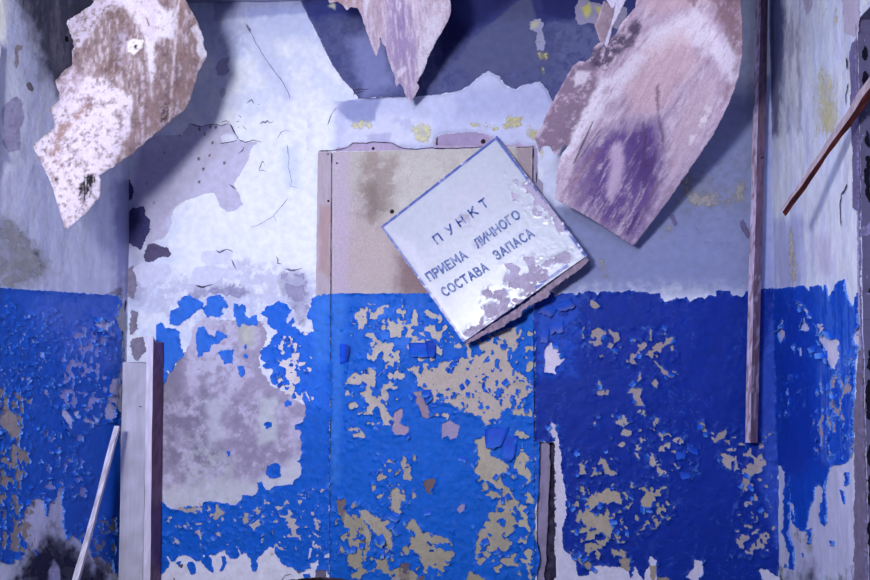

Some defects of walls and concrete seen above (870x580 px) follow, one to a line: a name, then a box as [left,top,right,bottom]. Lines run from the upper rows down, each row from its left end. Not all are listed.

flaking render [436,132,491,146]
peeling [0,266,146,556]
flaking render [160,317,455,580]
peeling [697,419,775,560]
damp [15,537,107,580]
peeling [78,517,120,578]
peeling [686,559,707,580]
flaking render [759,568,779,580]